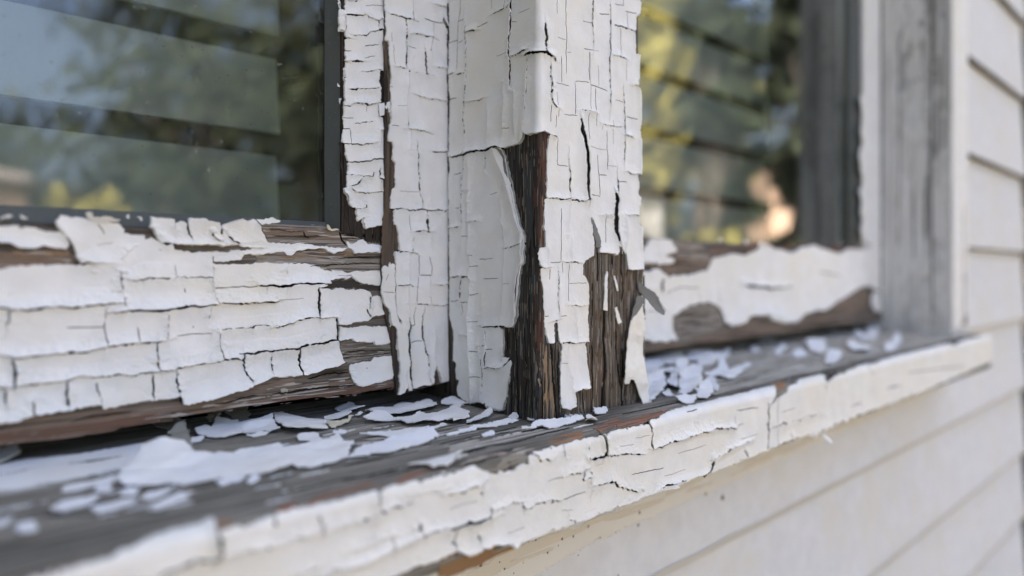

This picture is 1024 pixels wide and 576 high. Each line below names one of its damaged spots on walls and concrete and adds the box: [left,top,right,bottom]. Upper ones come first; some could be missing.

crack [0,221,350,415]
crack [342,0,529,390]
peeling [0,0,881,500]
crack [497,0,640,364]
peeling [693,325,961,404]
peeling [0,483,193,544]
peeling [437,545,514,576]
crack [162,373,816,576]